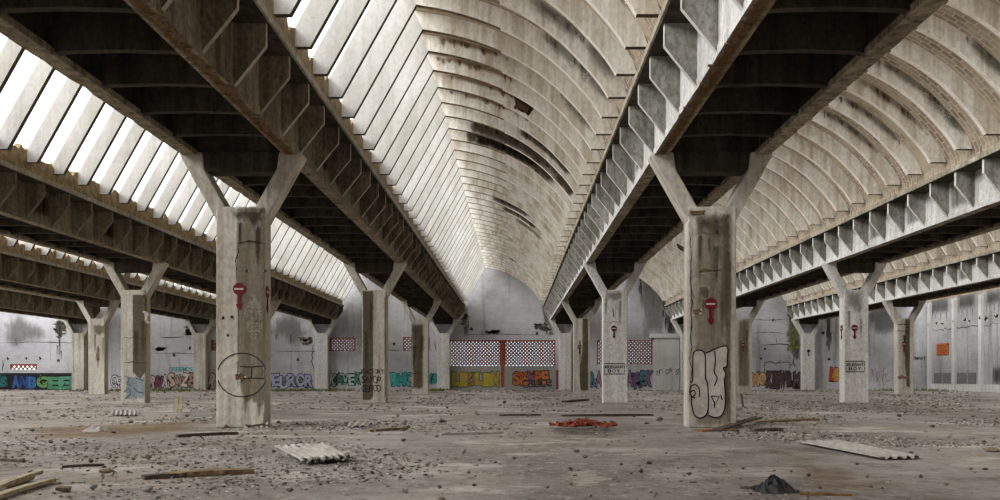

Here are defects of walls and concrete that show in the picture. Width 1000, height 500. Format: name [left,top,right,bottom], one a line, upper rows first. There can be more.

spalling [512,95,534,116]
damp [468,122,573,194]
damp [494,197,540,237]
damp [237,208,265,413]